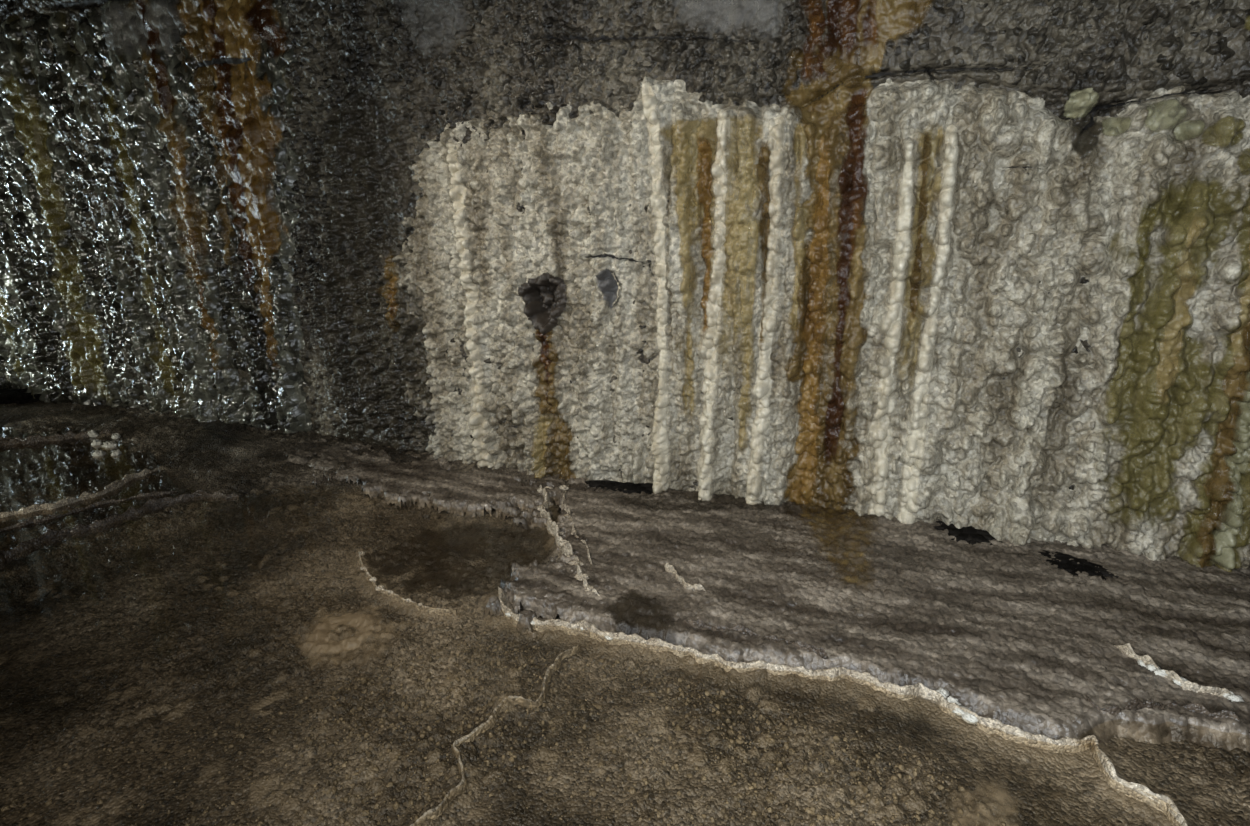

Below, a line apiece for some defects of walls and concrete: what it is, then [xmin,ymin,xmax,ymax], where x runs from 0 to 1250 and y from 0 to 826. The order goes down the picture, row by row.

corrosion [129,0,288,381]
spalling [518,272,567,335]
corrosion [531,329,576,481]
corrosion [661,116,771,450]
corrosion [784,0,932,511]
corrosion [902,128,945,373]